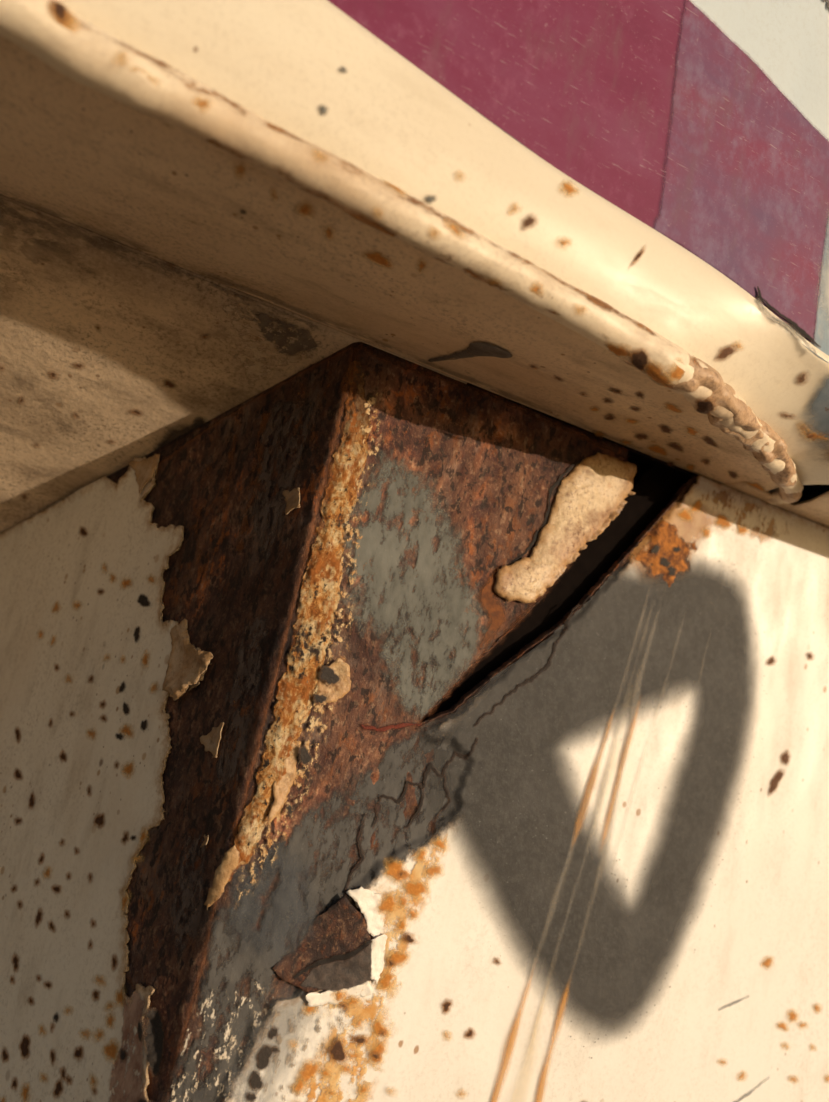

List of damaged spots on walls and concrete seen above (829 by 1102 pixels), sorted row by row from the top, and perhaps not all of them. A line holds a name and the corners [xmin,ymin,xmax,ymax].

rust [52,0,73,29]
rust [552,275,656,335]
rust [717,344,741,360]
peeling [162,560,230,733]
peeling [186,397,348,847]
peeling [107,342,637,678]
rust [74,345,685,1102]
crack [345,456,689,898]
peeling [499,474,697,671]
rust [631,490,775,587]
rust [769,751,790,794]
peeling [110,807,450,1102]